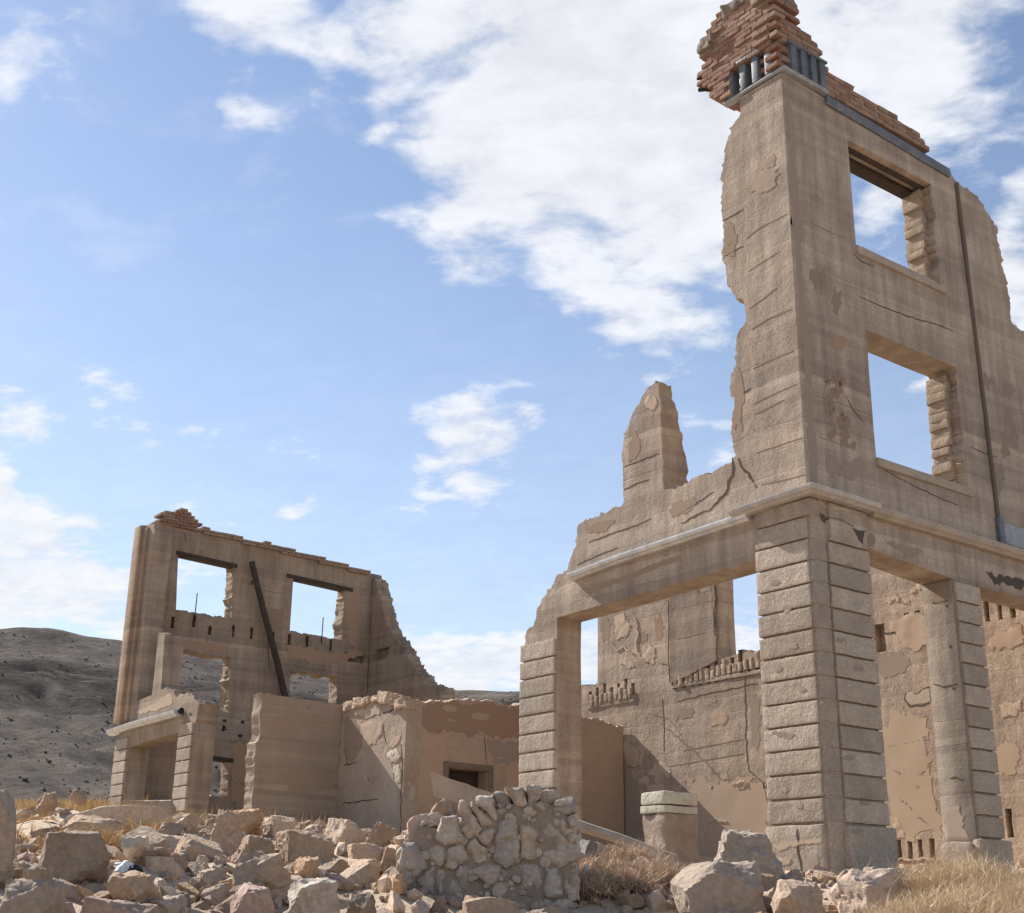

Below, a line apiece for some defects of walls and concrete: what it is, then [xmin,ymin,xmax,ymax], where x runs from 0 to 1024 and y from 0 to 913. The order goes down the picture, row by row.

crack [679,457,735,524]
spalling [610,613,656,669]
spalling [889,611,926,651]
spalling [987,622,1024,650]
crack [649,601,765,784]
crack [343,708,403,832]